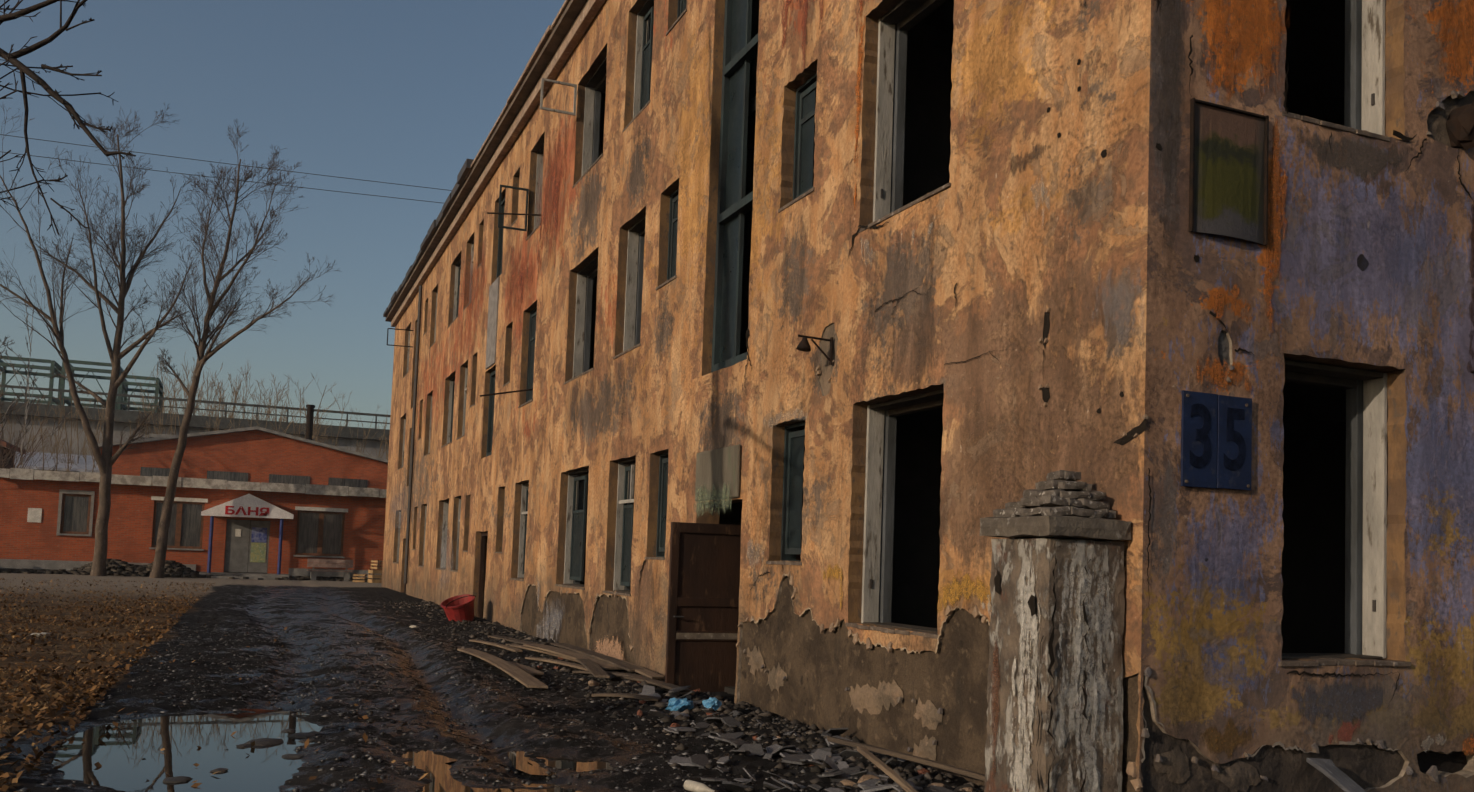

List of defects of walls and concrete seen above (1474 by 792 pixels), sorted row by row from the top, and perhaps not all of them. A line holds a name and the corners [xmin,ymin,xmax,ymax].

rust [781,0,823,69]
spalling [1426,90,1474,149]
crack [875,283,957,315]
spalling [519,584,642,683]
spalling [736,571,990,787]
peeling [1009,567,1040,792]
spalling [1058,560,1467,792]